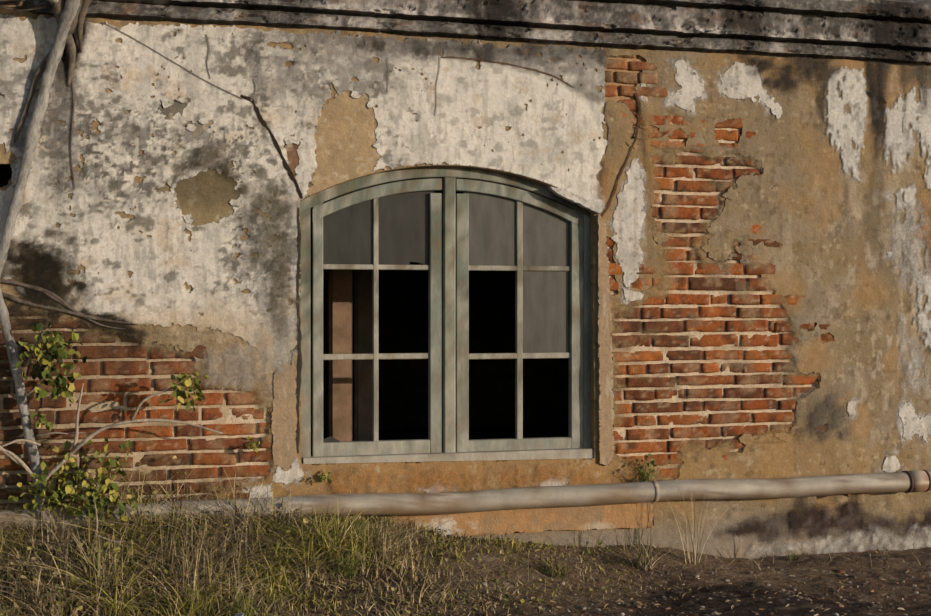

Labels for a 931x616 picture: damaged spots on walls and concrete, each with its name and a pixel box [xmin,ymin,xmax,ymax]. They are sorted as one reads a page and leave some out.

spalling [0,151,17,187]
crack [102,22,303,453]
peeling [174,169,241,228]
peeling [306,91,381,197]
crack [383,57,391,92]
crack [434,56,574,116]
flaking render [605,55,834,481]
peeling [825,66,868,182]
peeling [884,84,931,389]
flaking render [0,298,304,510]
peeling [882,399,931,473]
damp [730,495,931,554]